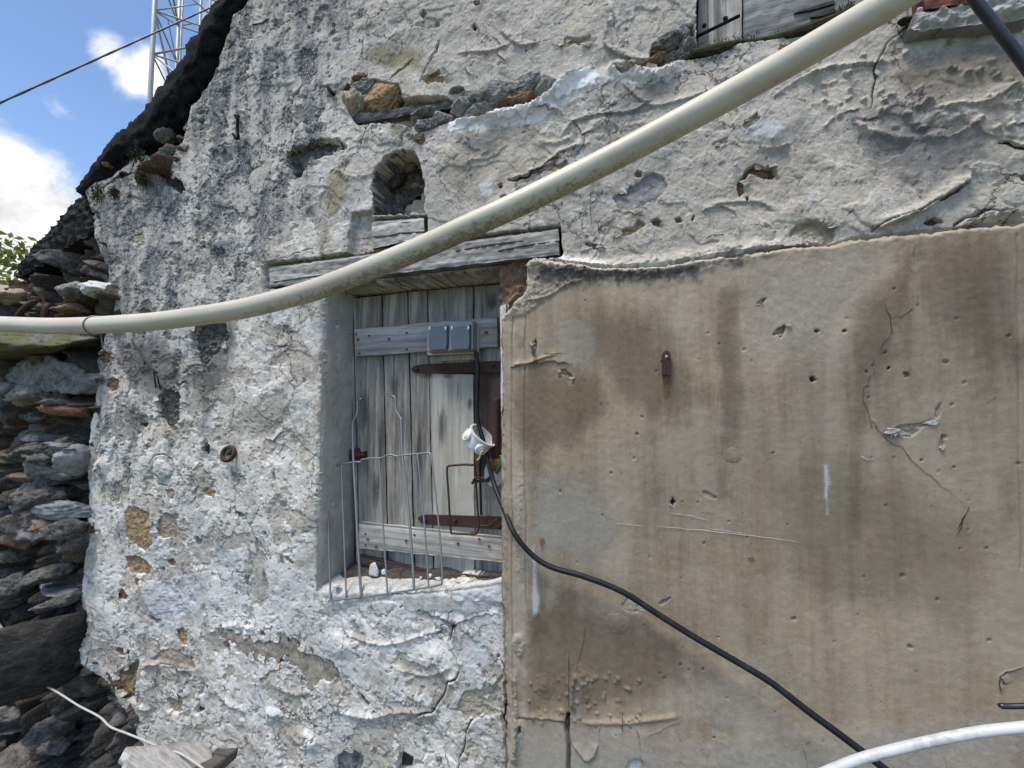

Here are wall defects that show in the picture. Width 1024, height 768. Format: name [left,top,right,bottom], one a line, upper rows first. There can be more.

spalling [643,22,698,68]
crack [845,29,905,113]
spalling [341,67,557,216]
spalling [742,115,759,130]
spalling [737,162,778,201]
spalling [586,172,694,251]
spalling [923,219,944,229]
damp [539,248,751,282]
crack [863,303,945,489]
spalling [884,403,940,438]
crack [385,613,494,737]